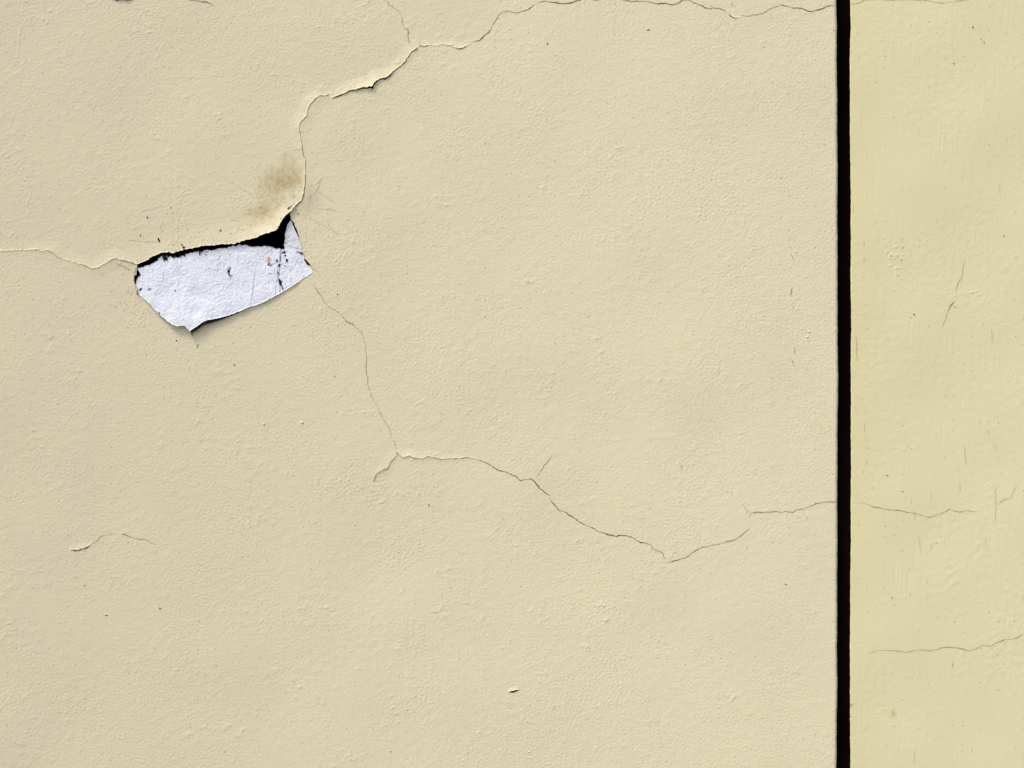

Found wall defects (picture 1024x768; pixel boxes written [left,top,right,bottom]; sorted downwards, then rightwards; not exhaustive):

crack [624,0,864,18]
crack [284,0,578,218]
crack [0,229,137,283]
peeling [125,185,321,333]
crack [314,285,833,562]
crack [69,534,156,551]